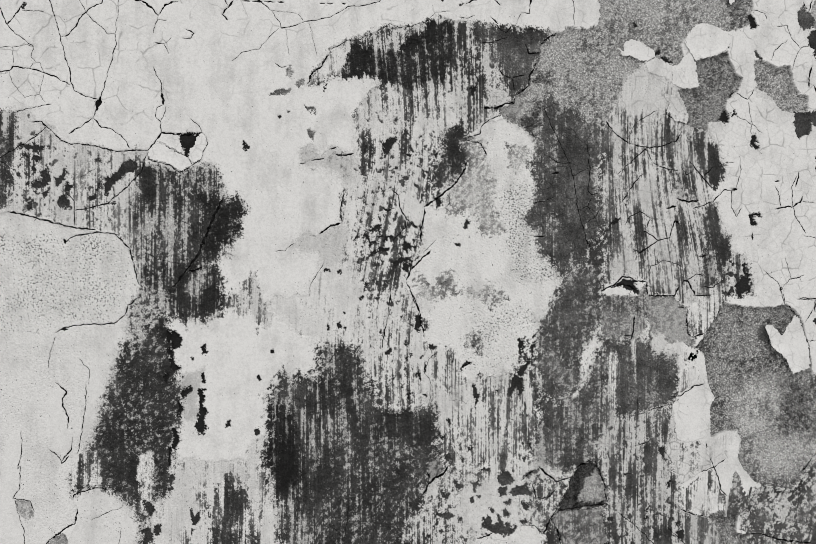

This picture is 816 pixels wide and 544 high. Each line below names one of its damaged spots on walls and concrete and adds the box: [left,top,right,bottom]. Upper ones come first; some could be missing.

crack [749,9,816,91]
crack [0,0,223,464]
peeling [0,110,275,544]
crack [222,0,742,544]
peeling [260,0,816,544]
crack [766,262,816,351]
crack [775,173,815,238]
crack [13,437,34,544]
crack [46,487,140,544]